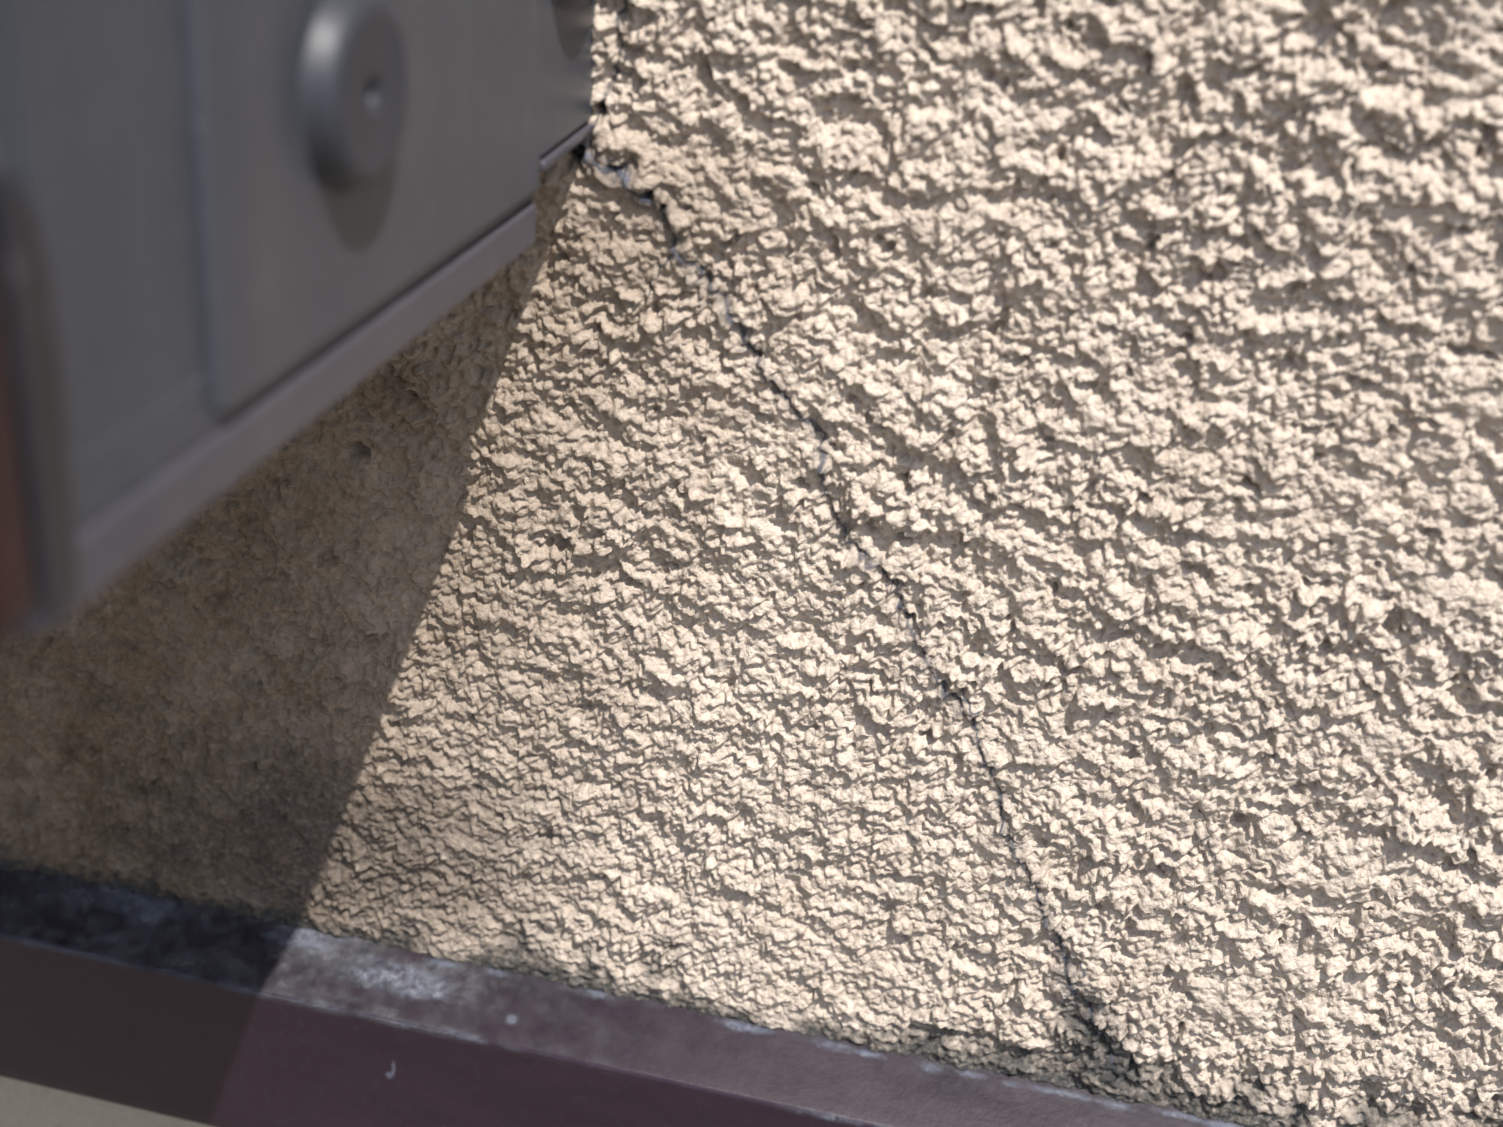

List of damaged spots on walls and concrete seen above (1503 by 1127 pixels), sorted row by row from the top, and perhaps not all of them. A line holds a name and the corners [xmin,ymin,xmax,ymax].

crack [586,0,1127,1096]
leakage [448,937,762,1028]
leakage [800,1001,1308,1127]
leakage [1344,1099,1410,1127]